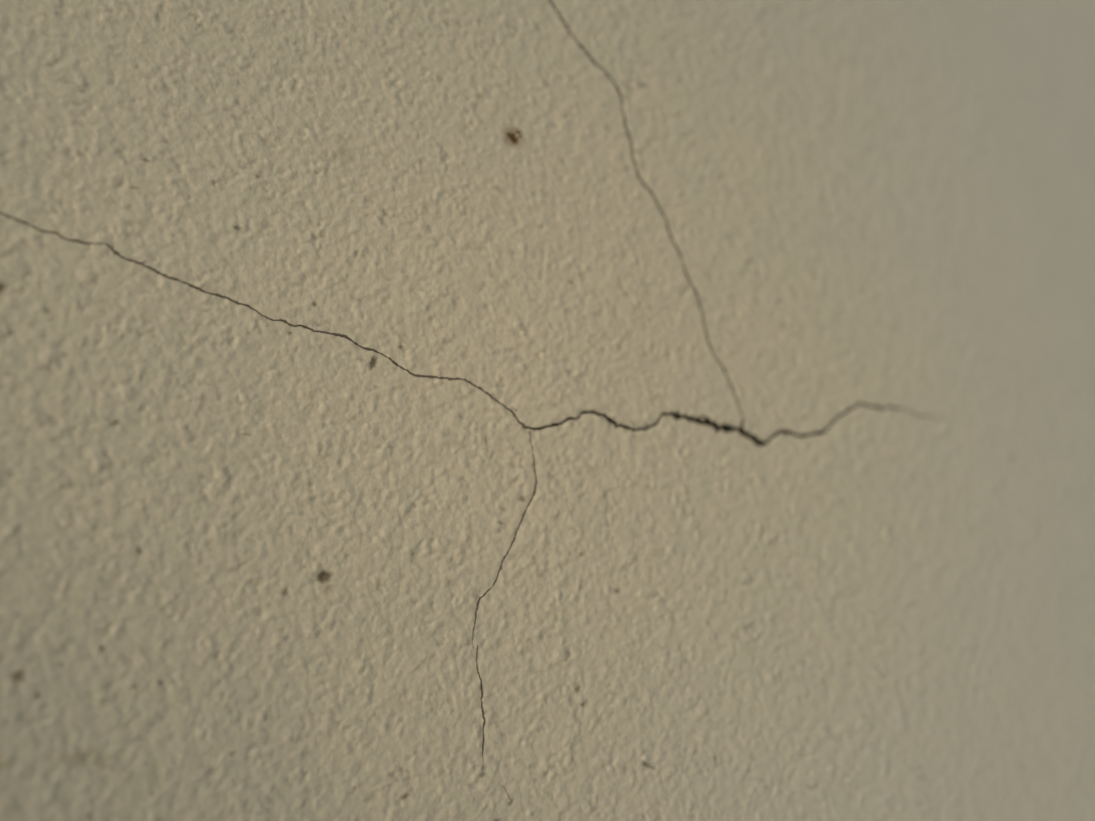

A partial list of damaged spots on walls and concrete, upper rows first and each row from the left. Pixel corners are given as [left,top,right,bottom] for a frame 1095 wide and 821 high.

crack [0,0,916,758]